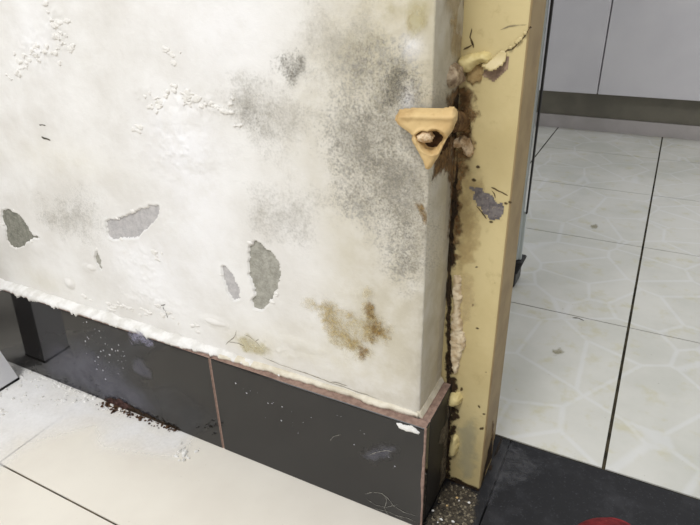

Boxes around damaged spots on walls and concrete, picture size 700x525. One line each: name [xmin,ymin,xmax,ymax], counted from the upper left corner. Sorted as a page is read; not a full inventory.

peeling [482,50,509,82]
spalling [469,178,512,223]
spalling [1,209,40,250]
spalling [107,205,160,242]
damp [432,86,477,393]
spalling [219,266,241,300]
spalling [247,241,281,309]
corrosion [104,397,180,431]
damp [445,406,479,491]